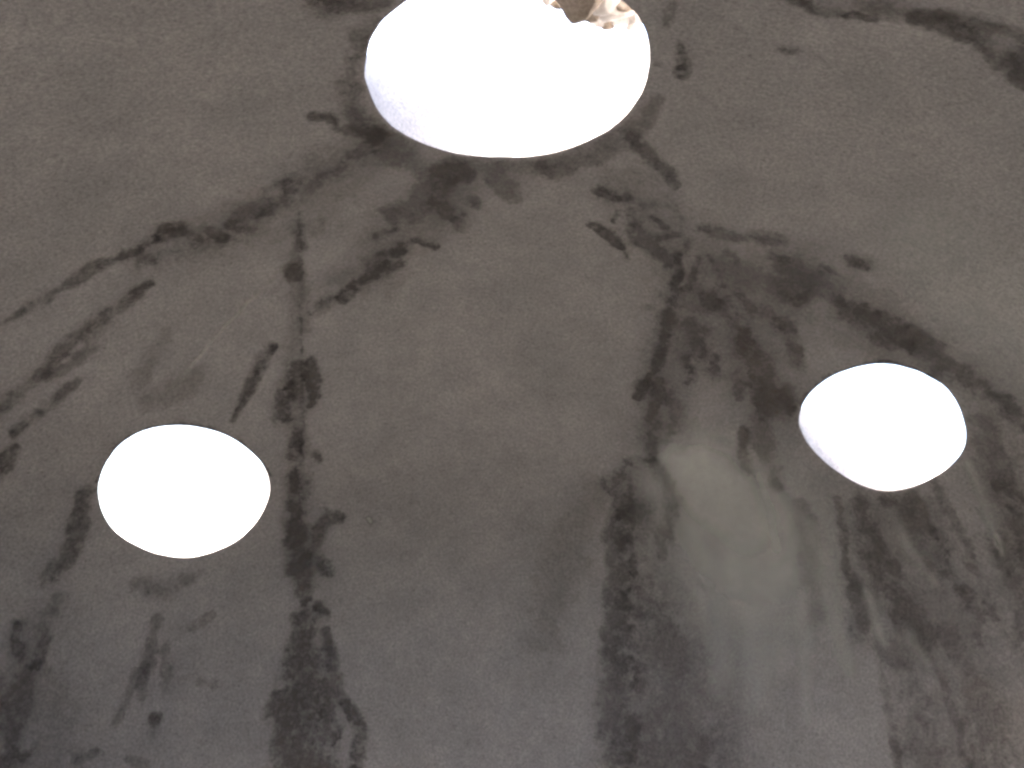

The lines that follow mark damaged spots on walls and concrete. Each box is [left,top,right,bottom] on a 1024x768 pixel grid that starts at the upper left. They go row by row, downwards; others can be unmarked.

leakage [788,0,1024,90]
leakage [51,222,185,301]
leakage [319,239,435,305]
leakage [587,222,650,257]
leakage [32,280,153,381]
leakage [232,344,278,422]
leakage [275,357,322,423]
leakage [632,253,796,580]
leakage [833,295,1020,415]
leakage [266,433,367,768]